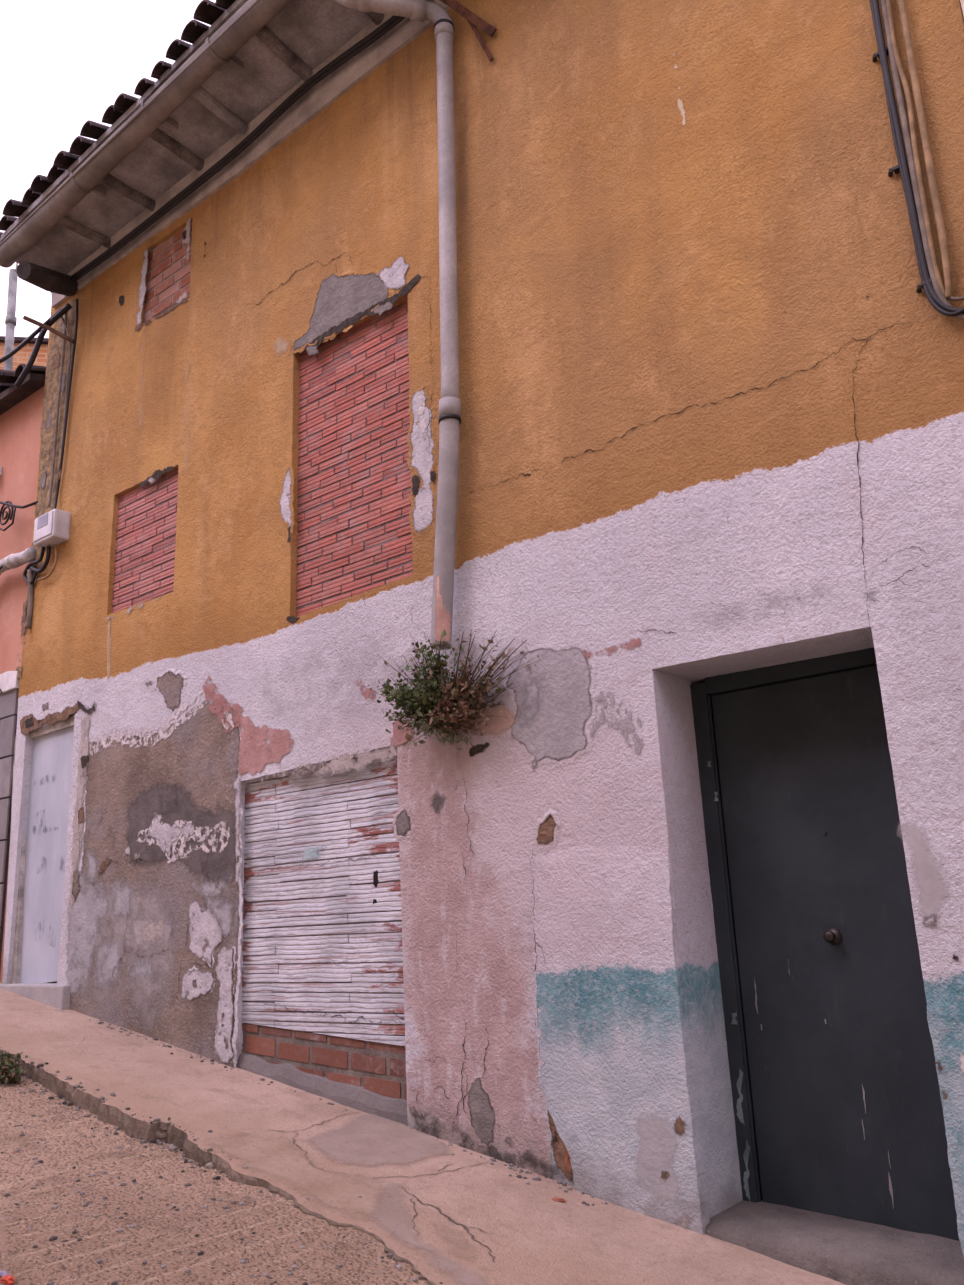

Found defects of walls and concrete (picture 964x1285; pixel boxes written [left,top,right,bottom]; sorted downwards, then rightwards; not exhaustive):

crack [253,252,352,305]
spalling [276,257,420,357]
peeling [406,383,438,537]
crack [458,315,959,626]
spalling [468,638,643,768]
flaking render [20,667,415,1069]
spalling [533,809,561,851]
crack [259,1020,496,1261]
spalling [548,1110,573,1181]